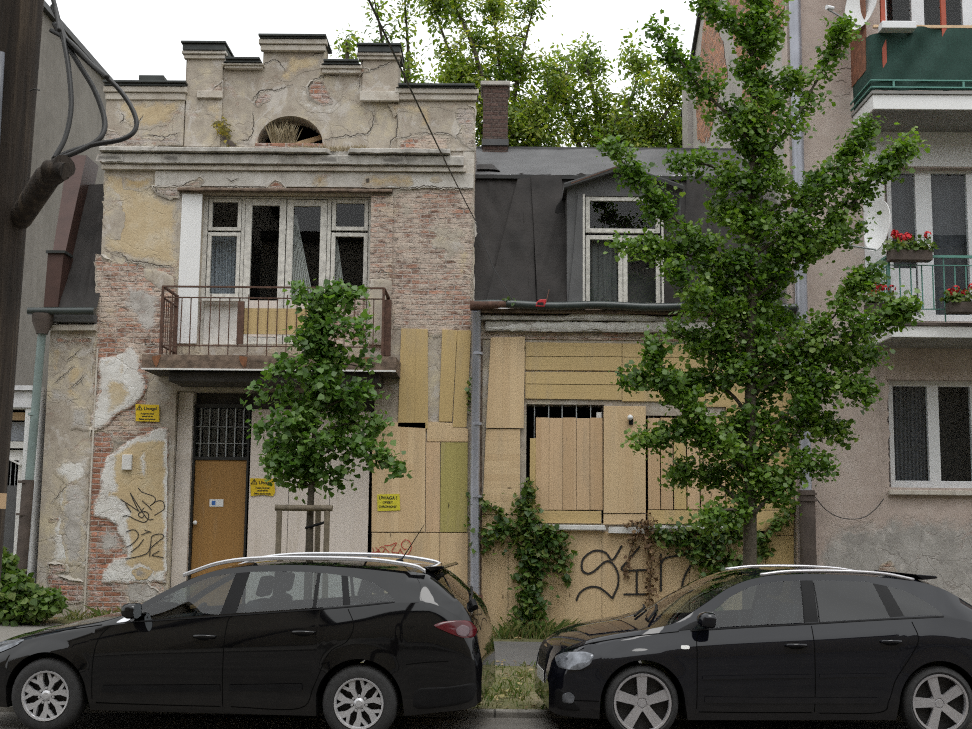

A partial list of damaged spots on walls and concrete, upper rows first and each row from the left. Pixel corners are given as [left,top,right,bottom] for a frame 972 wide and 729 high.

flaking render [279,52,341,113]
crack [240,53,390,142]
crack [325,114,455,147]
flaking render [362,174,477,344]
peeling [46,172,205,618]